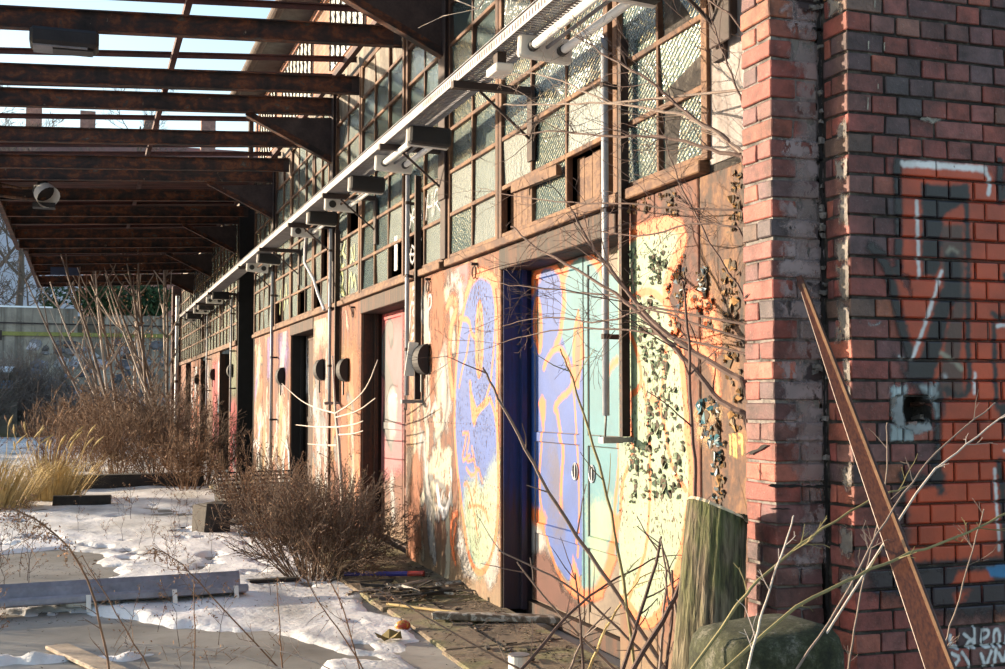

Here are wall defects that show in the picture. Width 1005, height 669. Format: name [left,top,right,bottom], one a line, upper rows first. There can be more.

peeling [727,169,742,232]
peeling [627,246,742,505]
spalling [890,396,925,427]